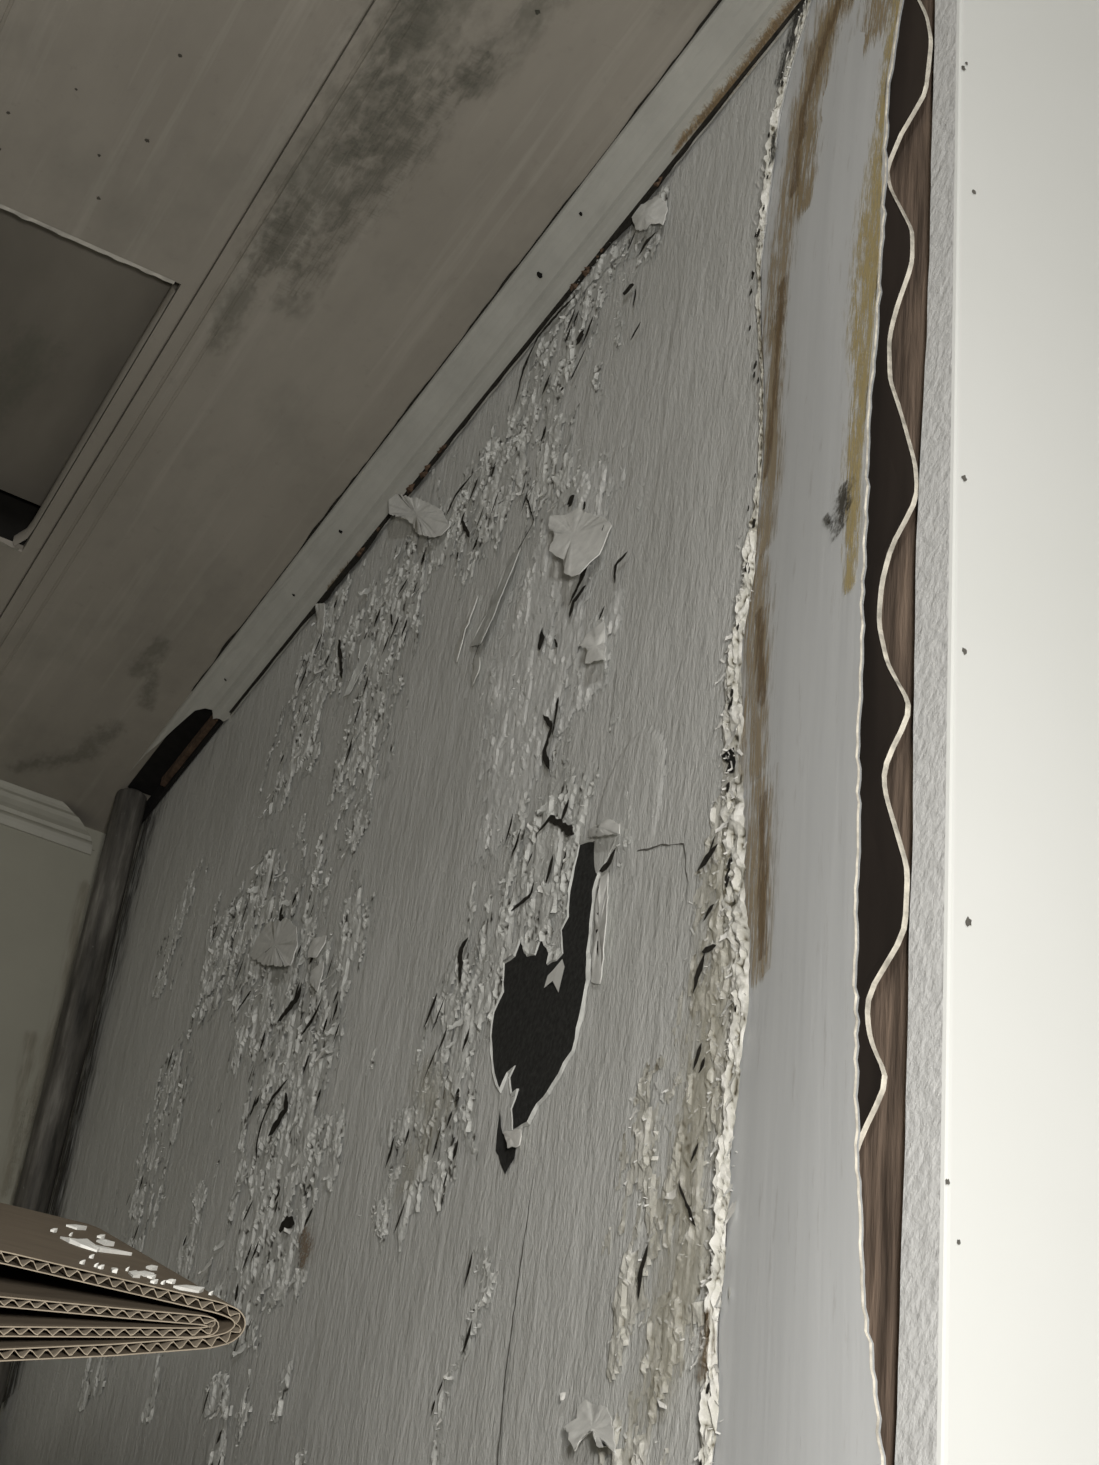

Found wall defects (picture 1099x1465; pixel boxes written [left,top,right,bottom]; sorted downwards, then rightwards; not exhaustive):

peeling [77,1356,114,1412]
peeling [114,184,685,1465]
peeling [560,795,733,1465]
damp [741,0,850,984]
damp [823,0,900,593]